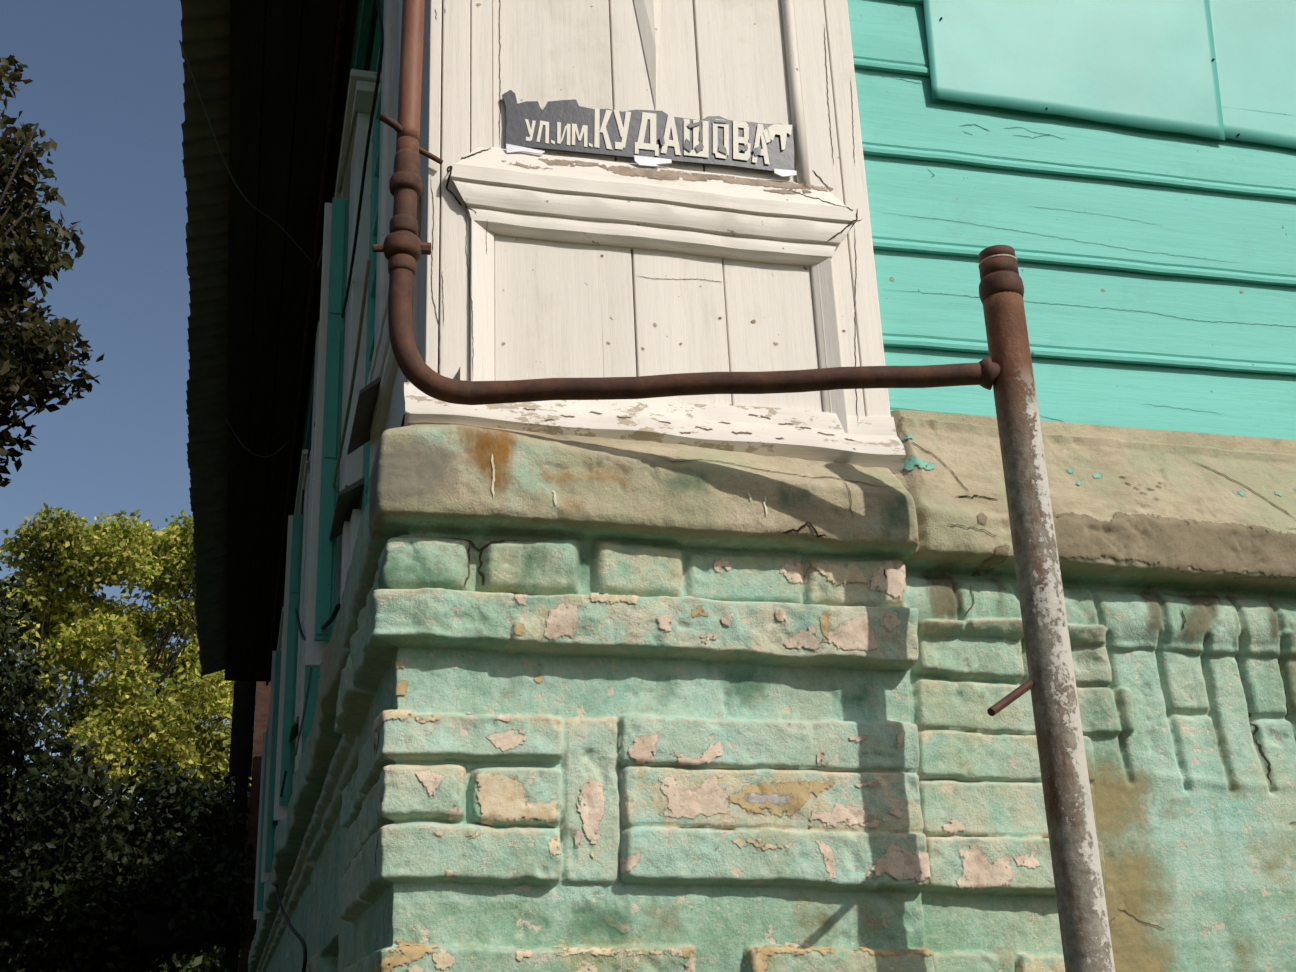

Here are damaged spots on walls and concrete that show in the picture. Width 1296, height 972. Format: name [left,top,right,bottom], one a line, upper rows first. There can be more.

crack [1192,460,1296,529]
crack [449,538,517,587]
peeling [514,594,528,605]
peeling [542,593,639,641]
peeling [775,557,906,652]
crack [1234,651,1294,785]
peeling [628,730,903,880]
peeling [618,852,641,875]
peeling [866,844,931,882]
peeling [943,817,1041,894]
peeling [374,938,456,972]
peeling [553,914,696,972]